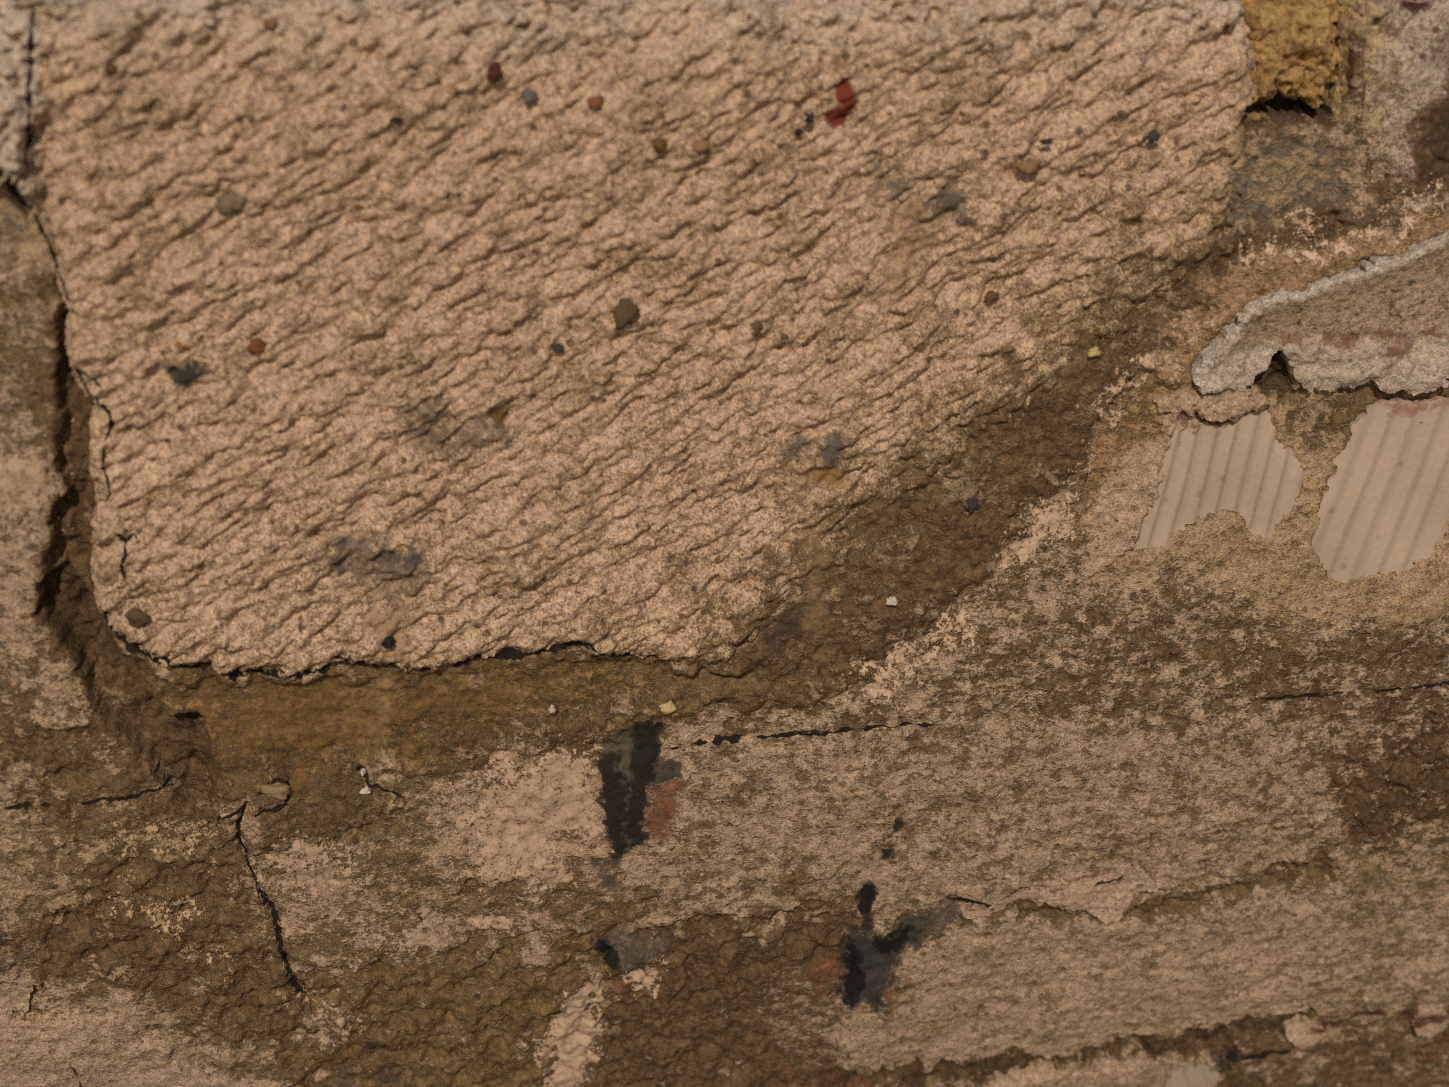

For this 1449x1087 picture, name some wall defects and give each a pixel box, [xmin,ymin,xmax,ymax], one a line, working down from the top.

leakage [1415,100,1449,195]
peeling [1280,206,1316,255]
peeling [1133,229,1449,583]
crack [1252,681,1449,700]
crack [668,722,948,750]
leakage [592,718,663,895]
crack [216,777,312,1011]
peeling [994,1056,1142,1087]
spalling [1165,1063,1221,1087]